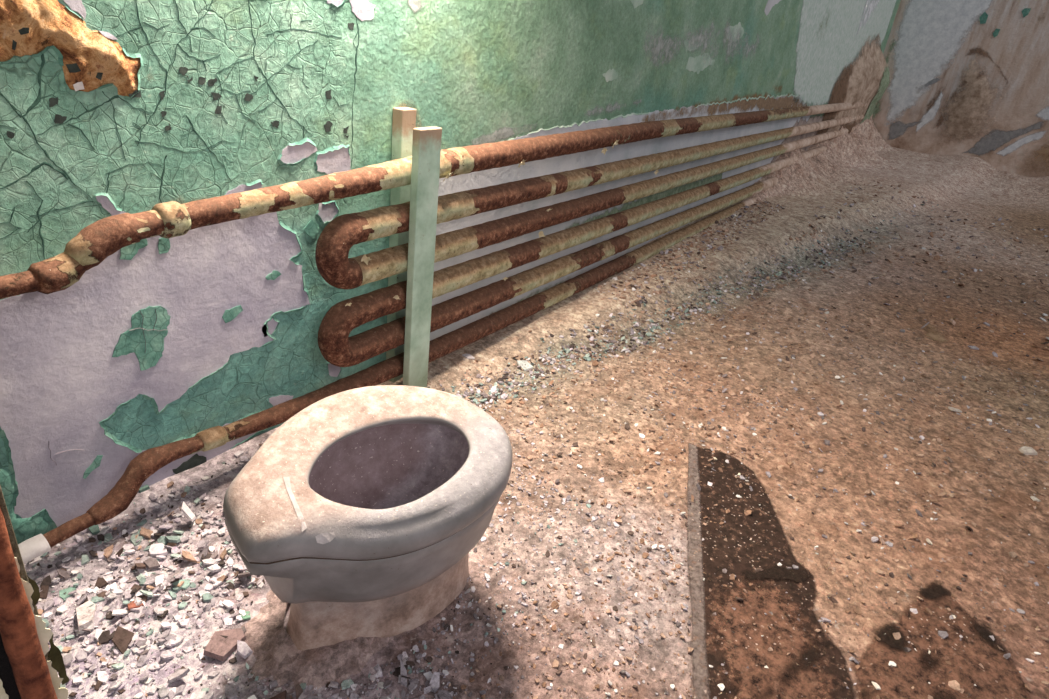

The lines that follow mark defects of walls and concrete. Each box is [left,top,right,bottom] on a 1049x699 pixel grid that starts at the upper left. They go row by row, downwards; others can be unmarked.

peeling [327,0,376,30]
crack [0,0,360,259]
peeling [277,121,351,174]
peeling [430,0,1000,341]
rust [645,89,807,122]
peeling [964,107,1049,156]
peeling [94,192,126,216]
peeling [0,200,339,544]